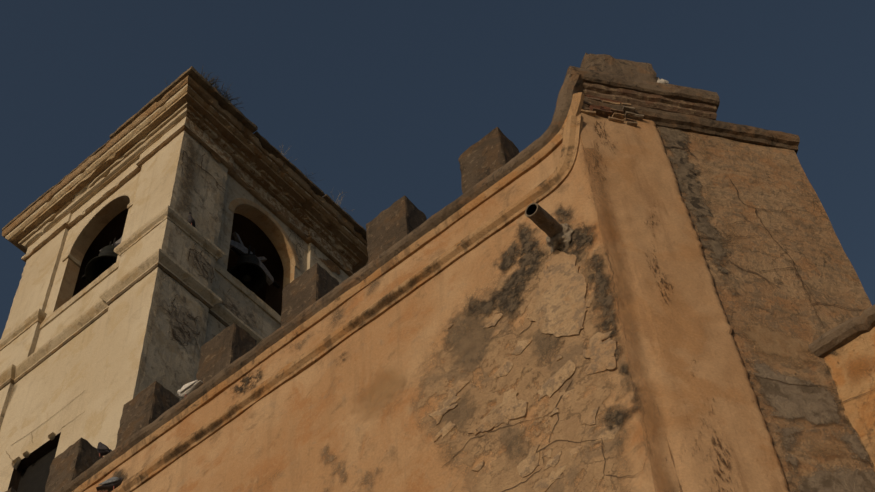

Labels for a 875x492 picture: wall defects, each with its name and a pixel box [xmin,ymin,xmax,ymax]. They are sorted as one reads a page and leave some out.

water stain [165,407,234,461]
water stain [234,370,262,397]
water stain [333,266,430,328]
water stain [442,396,474,428]
water stain [445,223,545,366]
peeling [413,241,628,492]
crack [444,381,649,492]
water stain [554,205,641,429]
water stain [713,438,731,492]
crack [703,179,865,325]